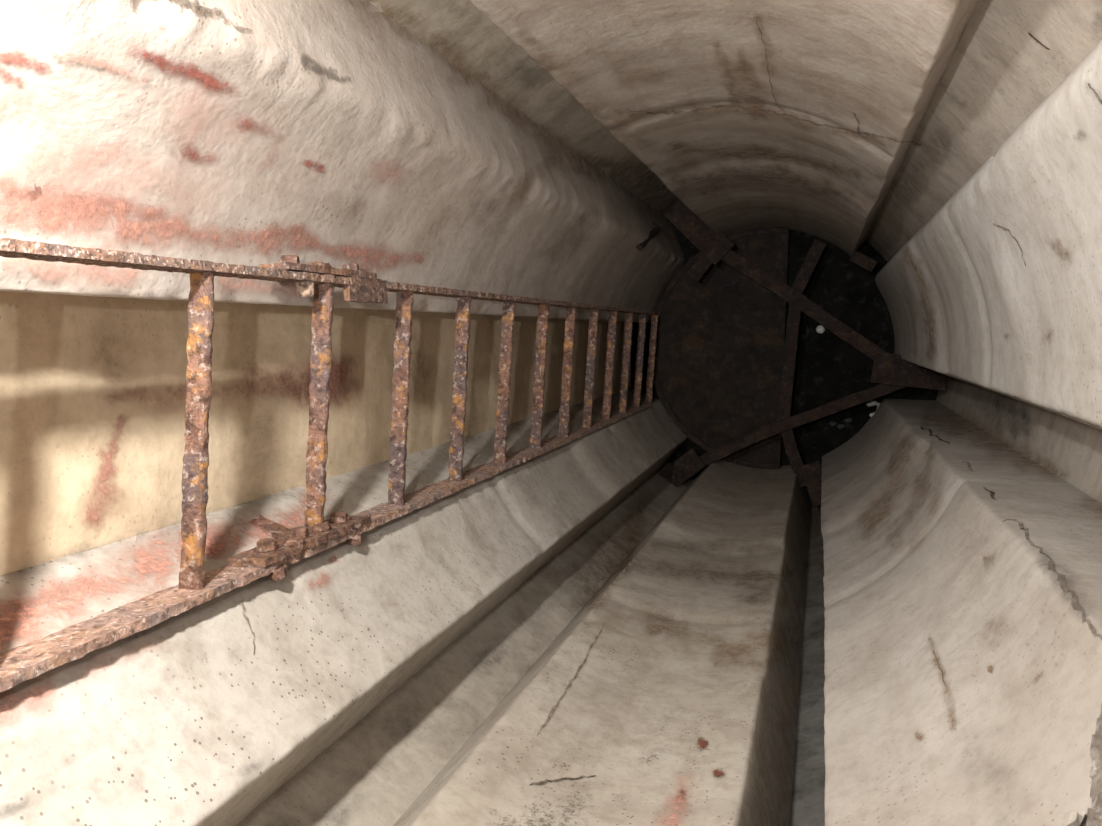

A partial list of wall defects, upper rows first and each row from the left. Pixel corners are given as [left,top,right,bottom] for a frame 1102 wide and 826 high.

corrosion [0,51,122,83]
corrosion [143,52,228,90]
crack [627,20,919,145]
corrosion [6,258,136,282]
corrosion [0,180,422,270]
corrosion [329,360,350,398]
corrosion [87,417,125,522]
corrosion [0,539,183,649]
corrosion [205,494,307,557]
spalling [1014,519,1082,611]
crack [538,631,602,734]
spalling [1058,702,1102,826]